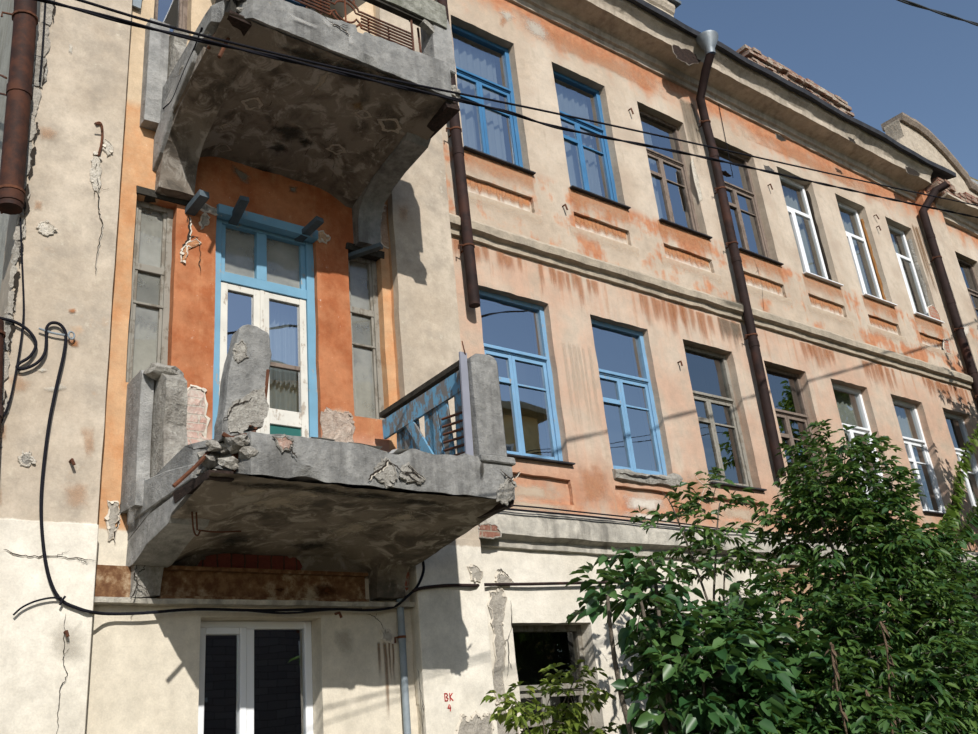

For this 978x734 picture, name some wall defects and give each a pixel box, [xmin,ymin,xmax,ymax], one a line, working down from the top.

spalling [2,0,57,414]
crack [94,163,106,274]
spalling [180,203,222,264]
spalling [172,384,259,488]
spalling [374,457,426,489]
crack [4,549,95,563]
peeling [104,500,120,542]
damp [236,483,437,522]
peeling [467,564,483,583]
flaking render [478,521,502,540]
rust [378,643,394,696]
peeling [455,572,520,734]